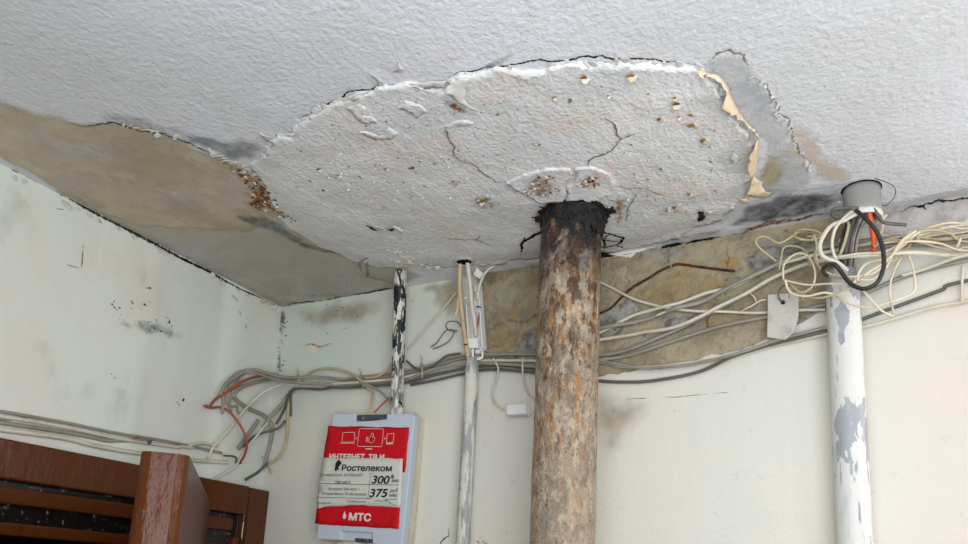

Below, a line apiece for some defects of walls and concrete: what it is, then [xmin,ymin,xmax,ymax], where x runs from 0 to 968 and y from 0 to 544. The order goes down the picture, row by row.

crack [445,127,506,183]
crack [587,118,635,167]
spalling [671,97,712,149]
peeling [697,70,773,204]
corrosion [223,162,297,222]
peeling [366,225,406,239]
crack [520,231,541,252]
corrosion [516,172,608,214]
damp [736,195,830,224]
spalling [477,265,539,371]
spalling [599,218,850,377]